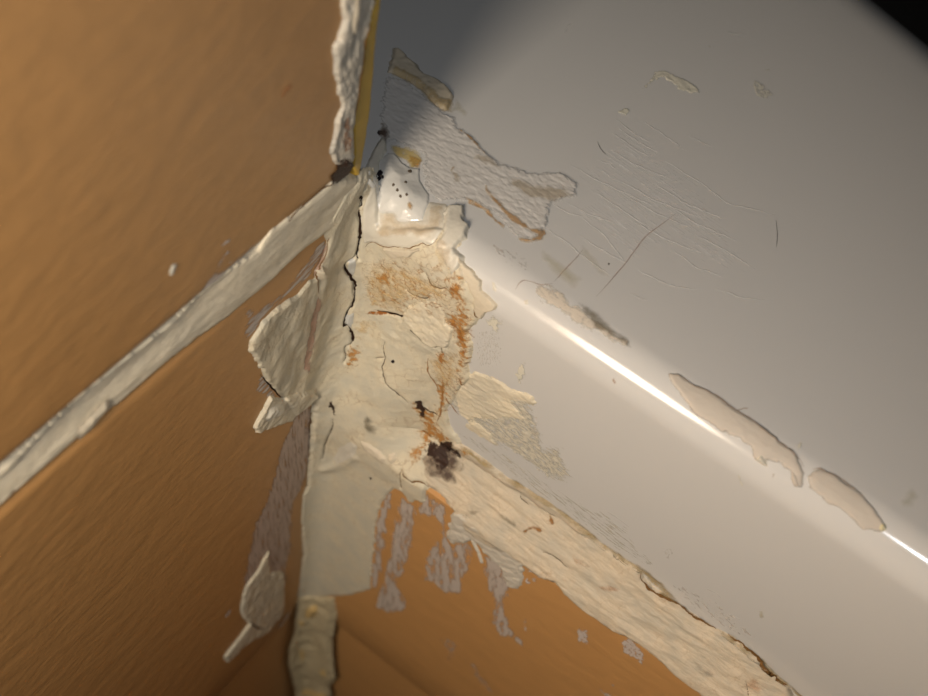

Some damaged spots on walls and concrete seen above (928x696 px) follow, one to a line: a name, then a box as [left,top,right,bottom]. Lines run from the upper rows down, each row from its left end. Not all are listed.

peeling [367,153,429,222]
crack [315,196,437,360]
corrosion [368,263,417,315]
peeling [402,301,453,348]
crack [374,343,408,403]
corrosion [410,276,471,459]
peeling [75,399,113,439]
peeling [253,389,318,433]